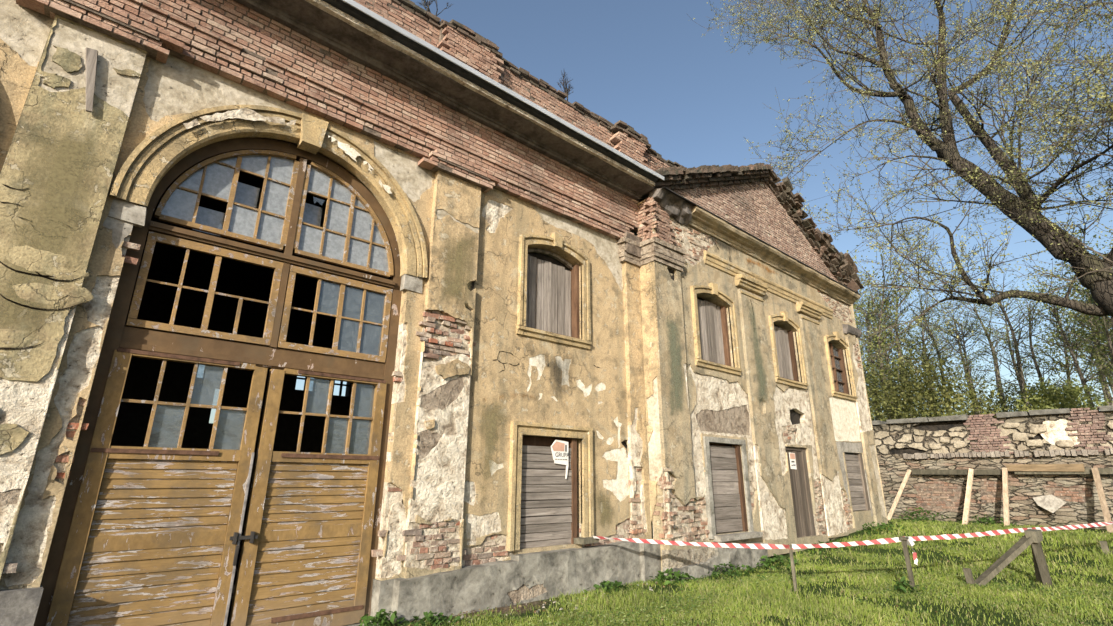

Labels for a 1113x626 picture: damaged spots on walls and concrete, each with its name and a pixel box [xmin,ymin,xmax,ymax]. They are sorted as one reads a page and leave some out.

leakage [0,265,51,327]
leakage [19,135,92,254]
peeling [103,216,141,265]
flaking render [0,275,120,587]
flaking render [371,305,513,579]
flaking render [527,354,606,404]
flaking render [577,363,788,569]
flaking render [773,336,926,536]
spalling [913,420,967,431]